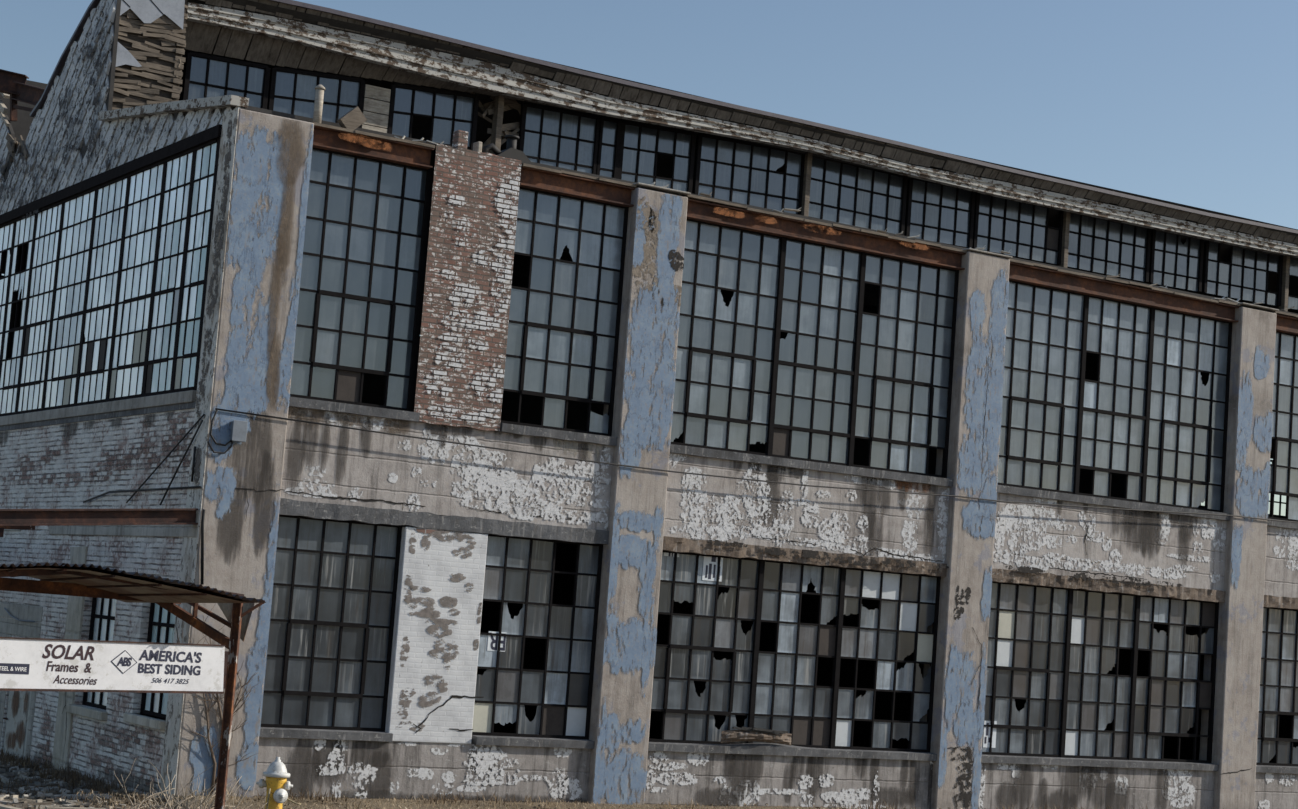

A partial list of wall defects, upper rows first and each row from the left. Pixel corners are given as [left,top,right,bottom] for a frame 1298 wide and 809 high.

corrosion [341,133,391,151]
peeling [1,120,314,520]
leakage [267,121,409,487]
leakage [218,415,275,561]
leakage [426,423,471,448]
leakage [734,461,803,519]
peeling [388,164,1298,698]
leakage [1113,507,1196,561]
peeling [236,466,363,790]
crack [413,695,484,733]
peeling [314,527,710,805]
peeling [714,771,886,809]